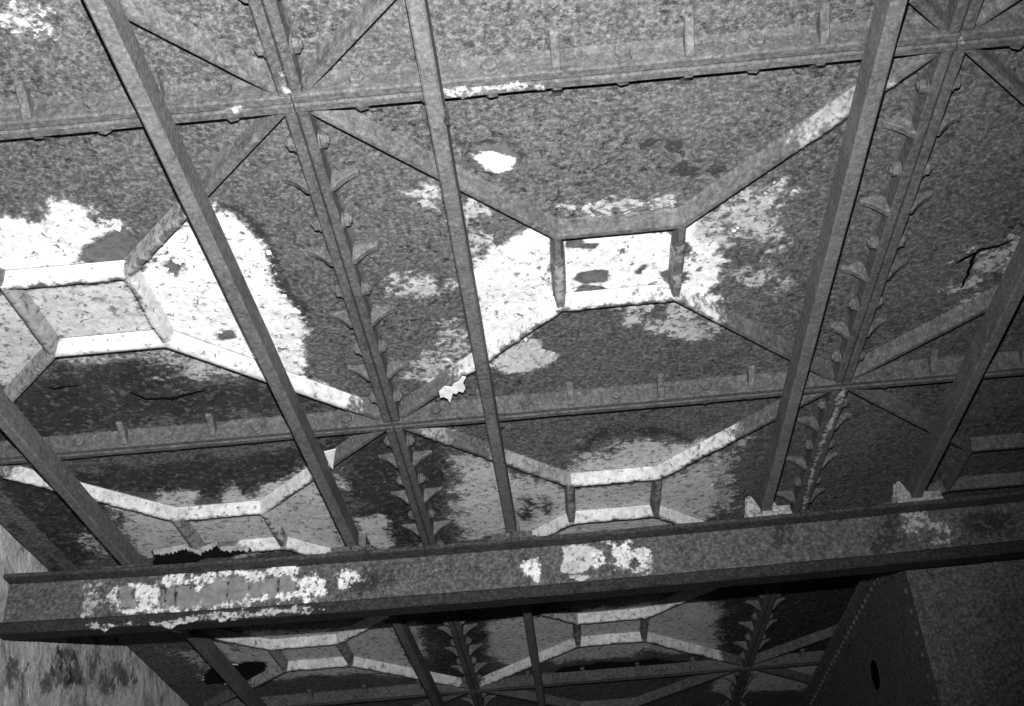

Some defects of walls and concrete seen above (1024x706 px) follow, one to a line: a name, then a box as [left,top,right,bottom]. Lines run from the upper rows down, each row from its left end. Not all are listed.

spalling [462,136,527,178]
spalling [401,178,447,222]
spalling [83,229,139,262]
spalling [164,258,184,276]
crack [956,239,1013,288]
spalling [218,330,236,341]
peeling [490,339,560,374]
peeling [439,376,466,402]
peeling [81,541,366,618]
peeling [519,557,542,583]
peeling [560,540,652,581]